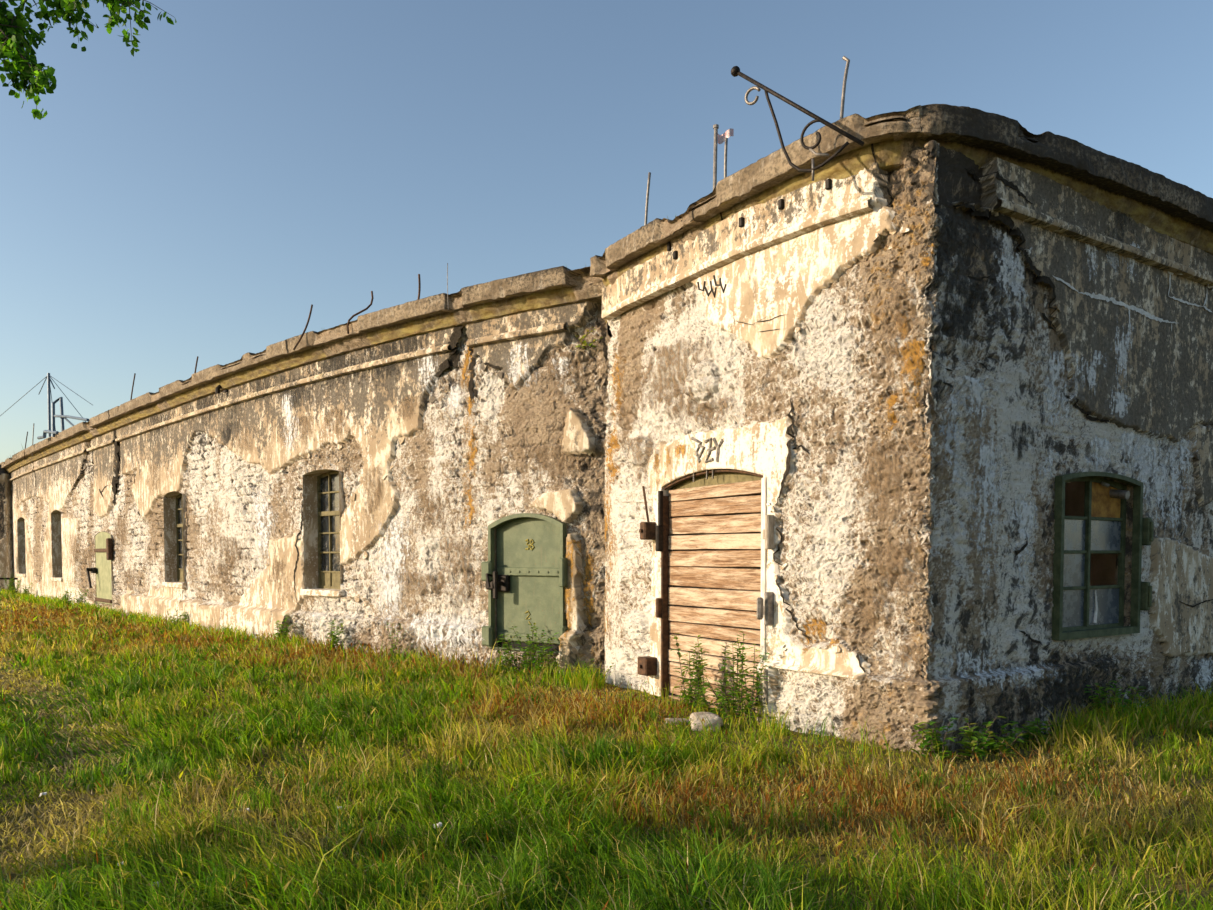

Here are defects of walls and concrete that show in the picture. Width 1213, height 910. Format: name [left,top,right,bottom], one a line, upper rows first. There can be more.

crack [953,168,1213,331]
spalling [0,431,364,608]
spalling [285,105,1213,754]
water stain [856,436,929,672]
water stain [882,209,1140,584]
water stain [1086,431,1196,549]